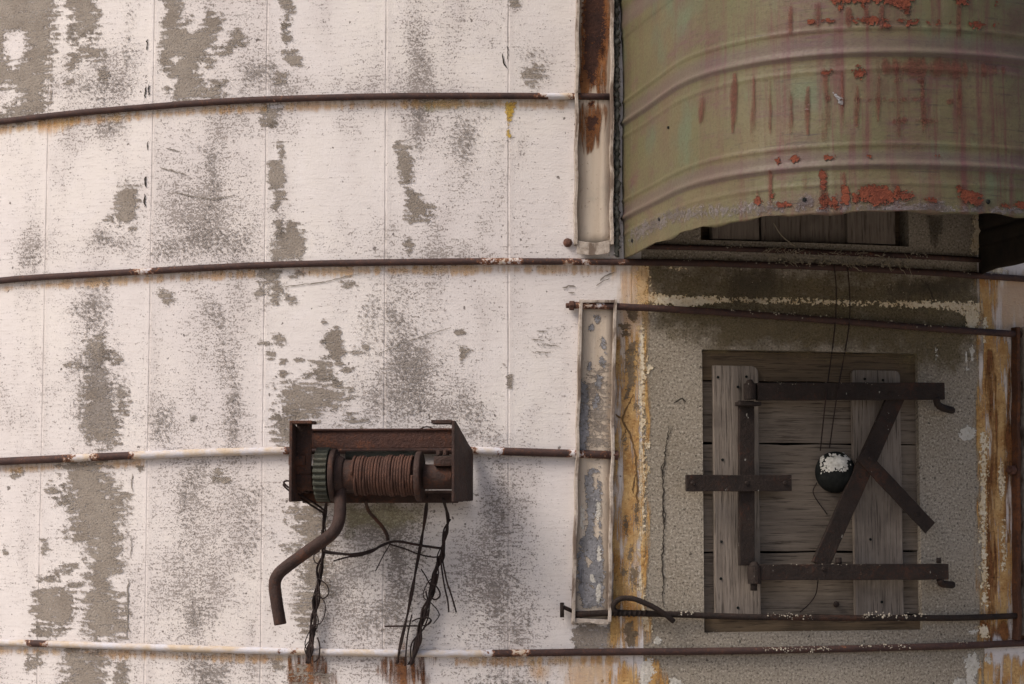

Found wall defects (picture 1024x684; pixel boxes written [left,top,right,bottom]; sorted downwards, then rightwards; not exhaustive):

peeling [0,0,142,134]
peeling [82,120,308,306]
peeling [157,0,305,102]
peeling [392,102,500,224]
rust [578,0,610,154]
peeling [27,280,195,684]
peeling [257,271,556,684]
rust [610,330,651,648]
crack [615,394,671,608]
peeling [569,266,988,649]
rust [976,279,1024,684]
rust [609,657,668,684]